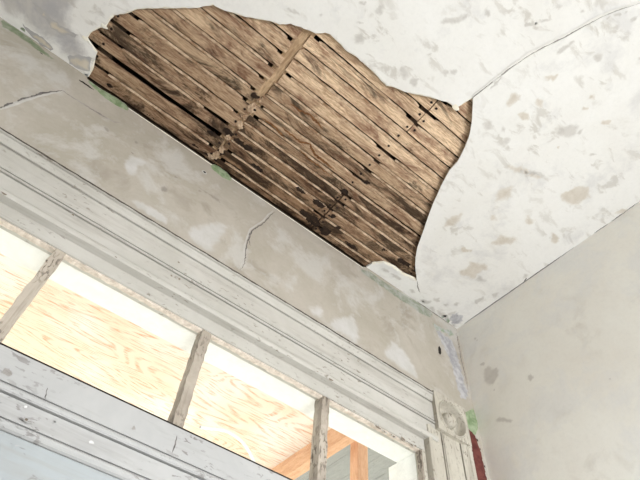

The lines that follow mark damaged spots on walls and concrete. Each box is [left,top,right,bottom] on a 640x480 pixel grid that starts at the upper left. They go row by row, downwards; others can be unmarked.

peeling [0,12,68,63]
crack [472,2,639,96]
crack [0,90,119,123]
crack [239,211,273,270]
peeling [82,3,487,480]